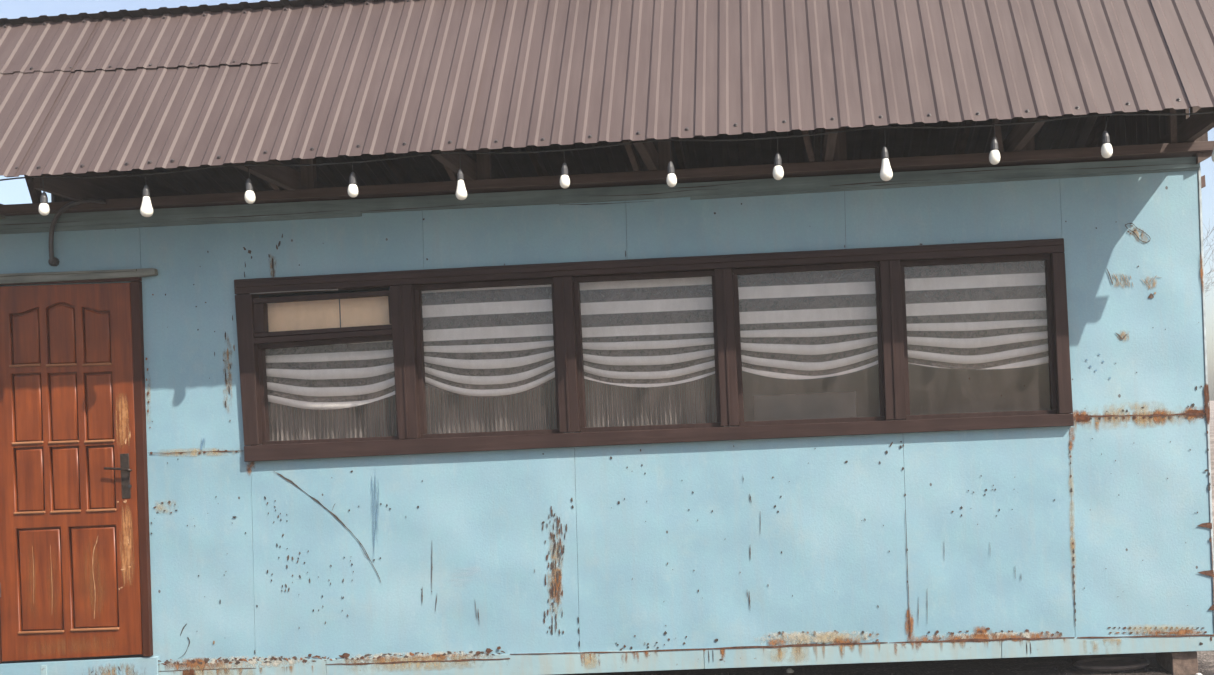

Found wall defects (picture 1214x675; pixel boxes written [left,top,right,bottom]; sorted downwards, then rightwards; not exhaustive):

rust [1069,384,1210,492]
rust [158,522,1214,675]